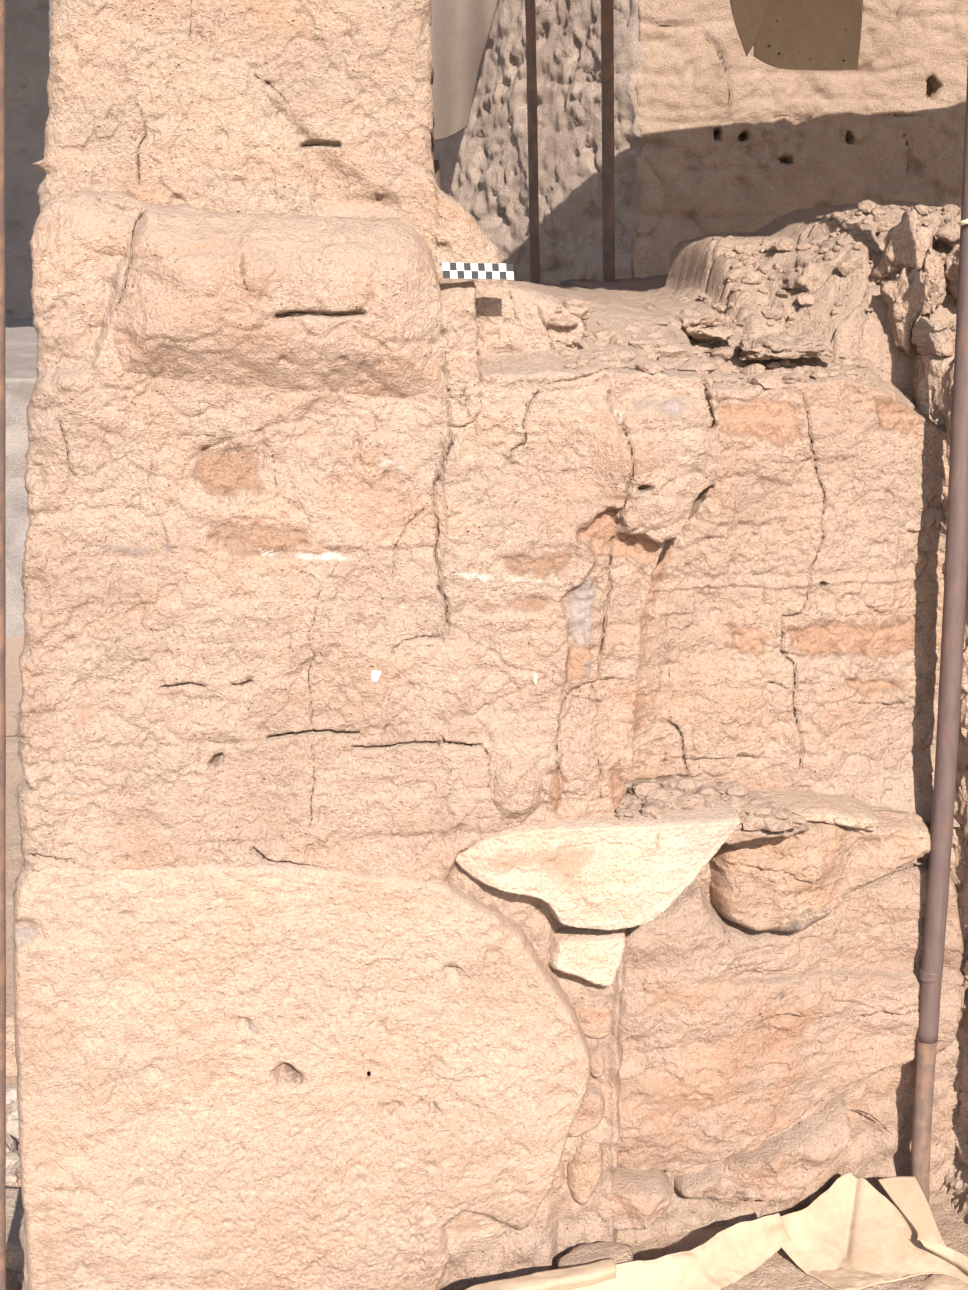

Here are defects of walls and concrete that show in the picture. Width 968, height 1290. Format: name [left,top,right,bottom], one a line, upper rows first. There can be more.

crack [117,214,143,306]
crack [60,423,75,476]
crack [275,551,395,828]
crack [399,362,482,645]
crack [556,428,634,771]
crack [769,407,906,769]